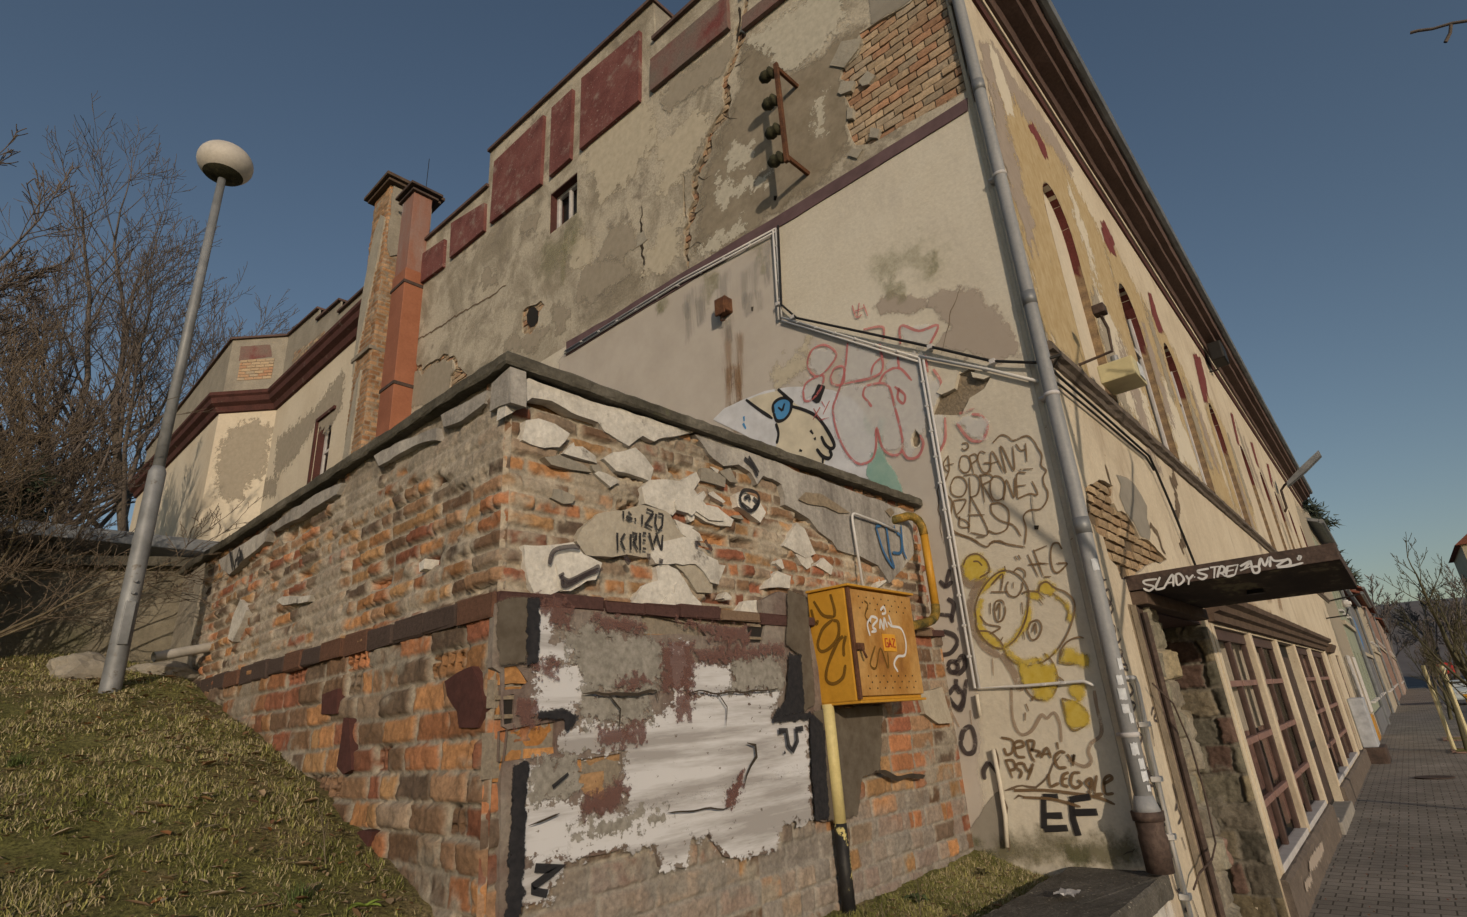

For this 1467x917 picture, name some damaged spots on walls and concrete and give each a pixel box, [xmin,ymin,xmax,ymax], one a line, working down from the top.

crack [684,0,749,267]
crack [636,205,648,281]
peeling [563,0,1322,554]
flaking render [1085,475,1163,579]
peeling [374,301,914,917]
peeling [918,687,952,724]
peeling [971,792,1004,855]